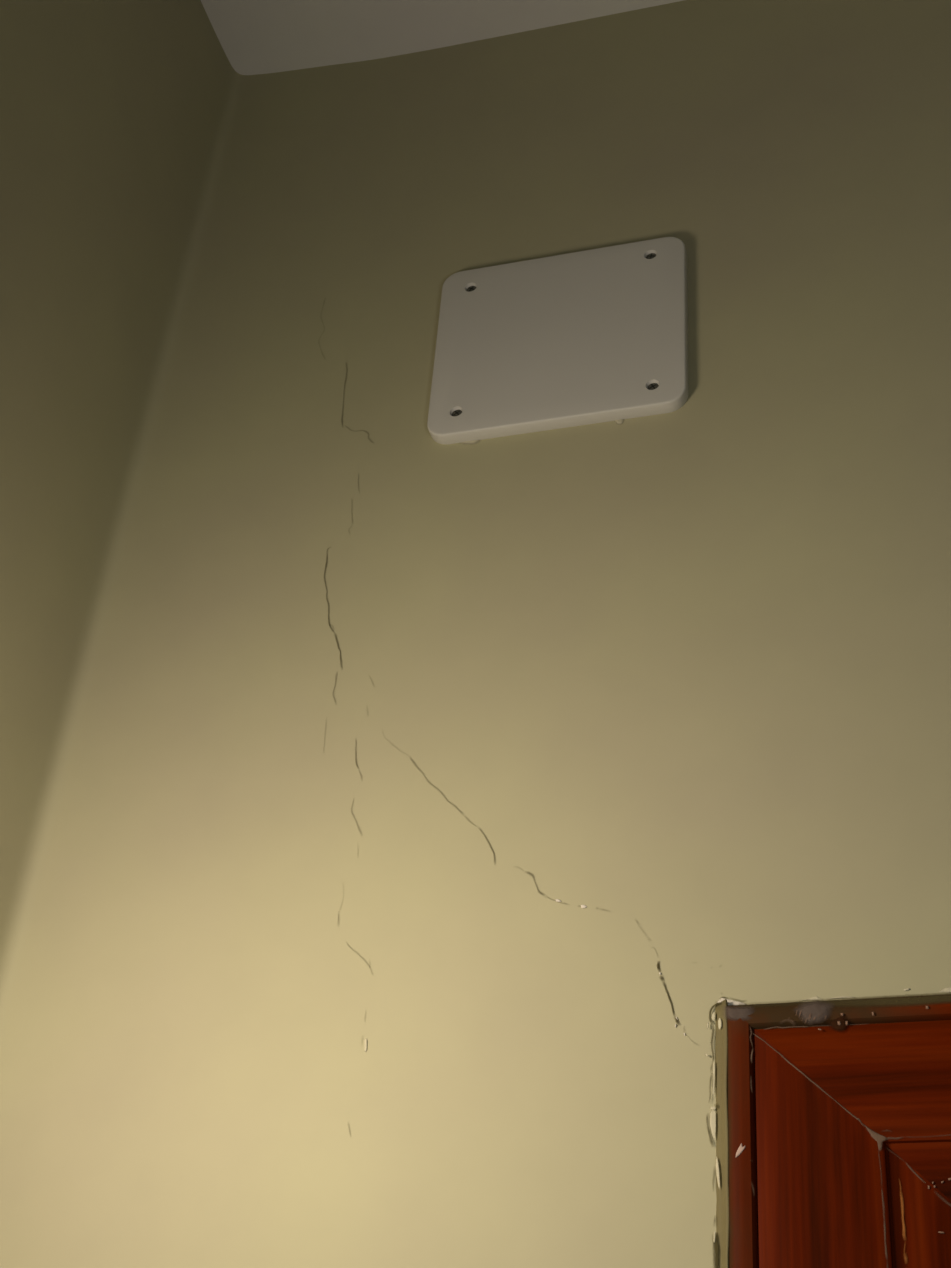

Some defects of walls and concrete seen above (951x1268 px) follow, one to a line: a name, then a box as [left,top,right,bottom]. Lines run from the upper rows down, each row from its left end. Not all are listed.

crack [657,962,725,1181]
crack [712,1234,720,1268]